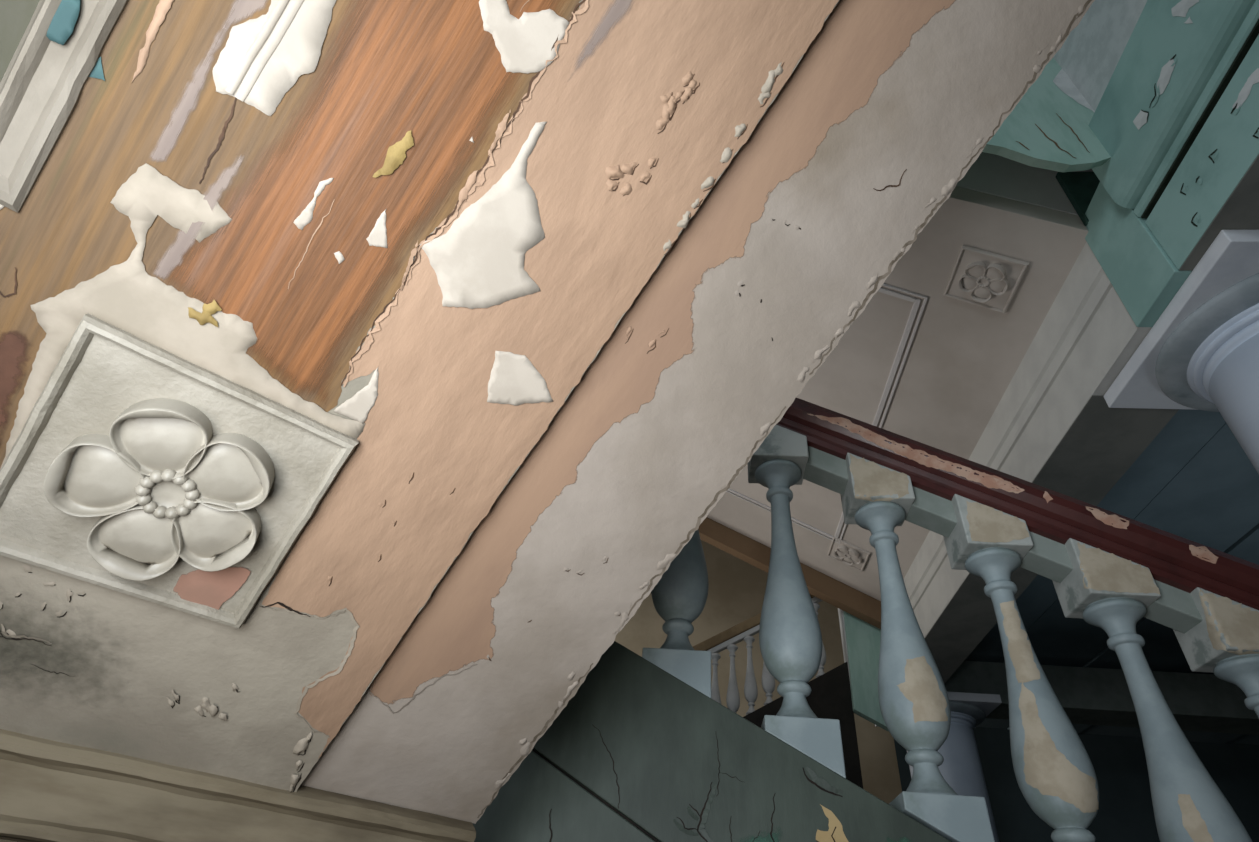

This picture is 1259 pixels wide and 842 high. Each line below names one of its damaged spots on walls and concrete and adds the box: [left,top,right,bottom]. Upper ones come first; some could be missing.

crack [1016,113,1090,158]
crack [0,267,17,298]
peeling [0,0,955,792]
peeling [808,414,1024,493]
peeling [966,501,1030,543]
peeling [1086,506,1129,529]
peeling [1078,542,1160,594]
peeling [1199,589,1259,655]
peeling [1000,600,1099,813]
crack [592,724,620,809]
crack [803,766,843,797]
peeling [816,804,848,842]